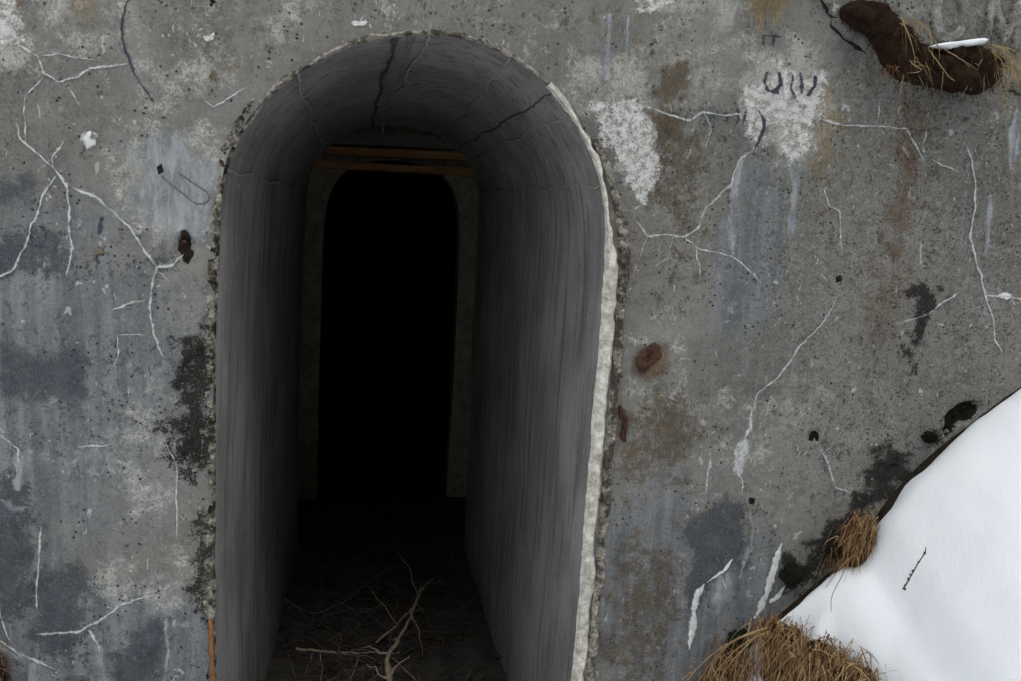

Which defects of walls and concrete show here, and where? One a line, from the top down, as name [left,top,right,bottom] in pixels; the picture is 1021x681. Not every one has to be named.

peeling [635,0,675,14]
crack [0,0,184,370]
crack [626,96,1021,353]
corrosion [618,405,629,442]
spalling [585,98,663,681]
corrosion [635,342,663,372]
crack [752,296,838,412]
crack [159,430,178,533]
crack [820,449,859,499]
crack [34,526,42,608]
crack [0,595,152,669]